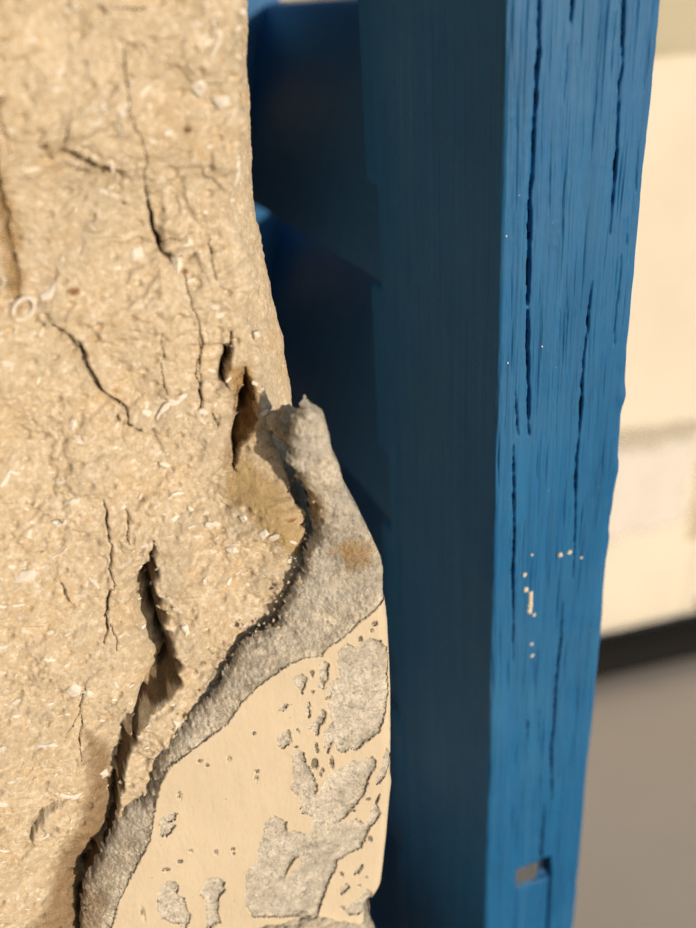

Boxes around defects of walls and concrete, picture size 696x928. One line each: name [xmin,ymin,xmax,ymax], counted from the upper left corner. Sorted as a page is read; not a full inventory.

crack [0,178,20,298]
crack [77,340,129,425]
spalling [0,0,311,928]
crack [123,49,217,281]
crack [184,274,257,468]
crack [516,178,531,424]
crack [531,7,539,153]
crack [574,384,582,518]
crack [610,149,618,202]
crack [65,687,86,761]
crack [77,499,181,928]
peeling [246,621,389,916]